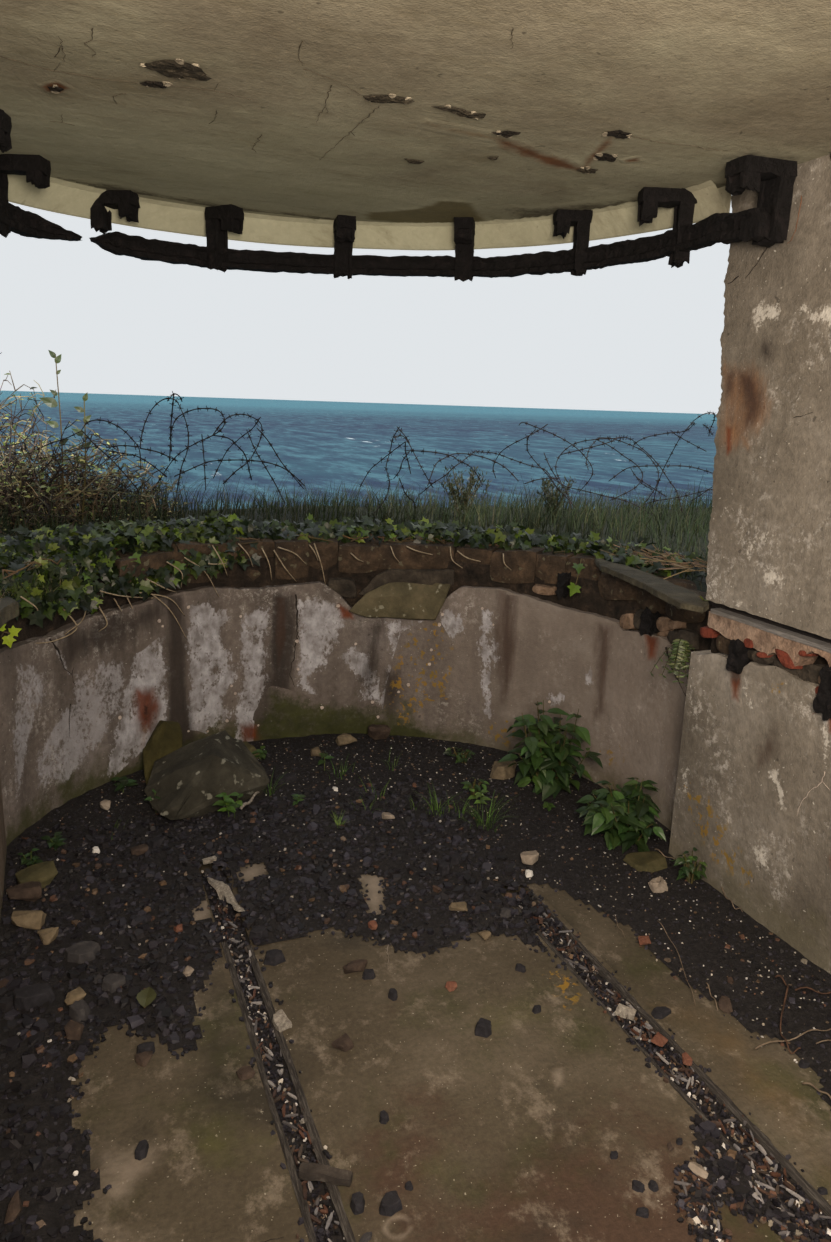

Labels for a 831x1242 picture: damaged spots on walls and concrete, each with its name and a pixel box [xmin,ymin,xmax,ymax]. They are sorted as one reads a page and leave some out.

spalling [139,58,212,89]
spalling [363,94,415,104]
spalling [433,105,486,119]
spalling [492,130,521,138]
corrosion [414,118,646,176]
leakage [747,293,831,374]
corrosion [716,347,786,470]
corrosion [130,685,164,752]